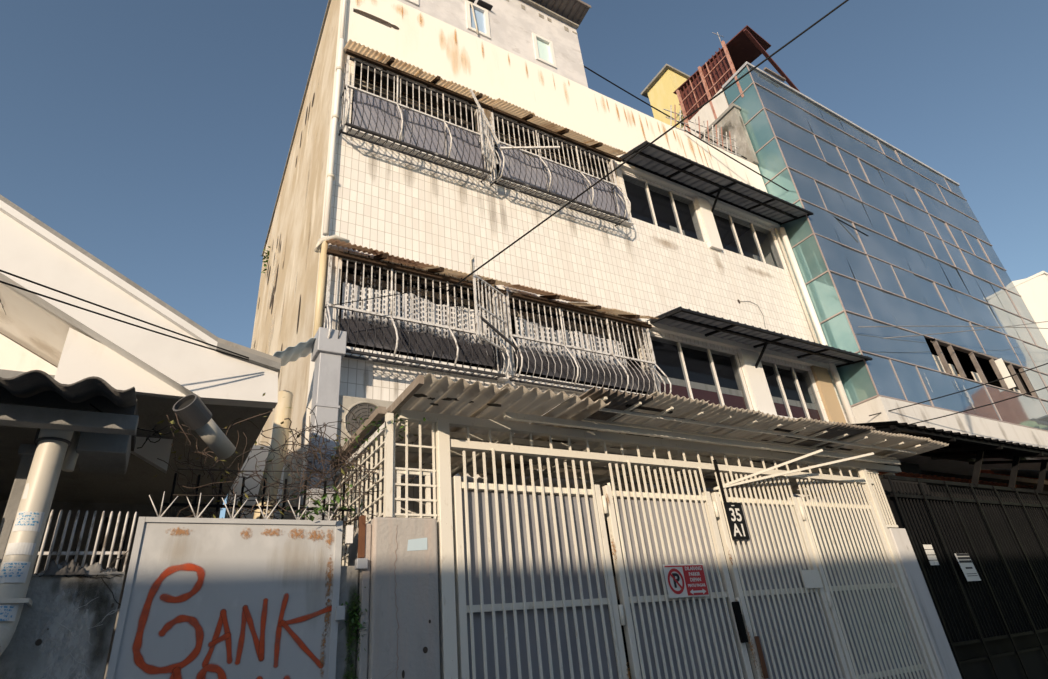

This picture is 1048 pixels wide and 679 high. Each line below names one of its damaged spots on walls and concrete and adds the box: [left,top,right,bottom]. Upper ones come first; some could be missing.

corrosion [263,529,334,545]
water stain [37,579,114,679]
corrosion [320,562,333,674]